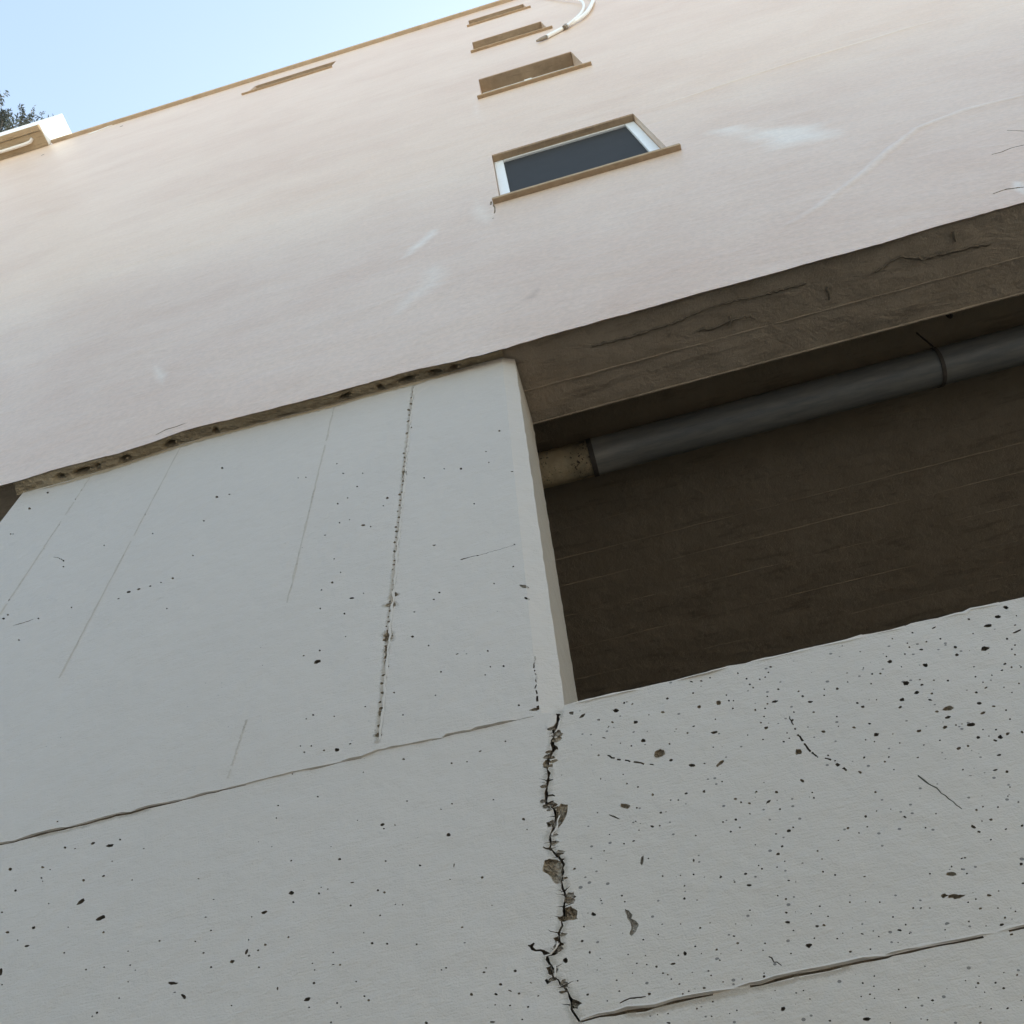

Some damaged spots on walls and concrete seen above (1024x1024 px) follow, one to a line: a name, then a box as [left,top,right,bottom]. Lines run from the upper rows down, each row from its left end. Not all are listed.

crack [874,230,991,273]
crack [591,282,831,348]
crack [0,657,1024,1023]